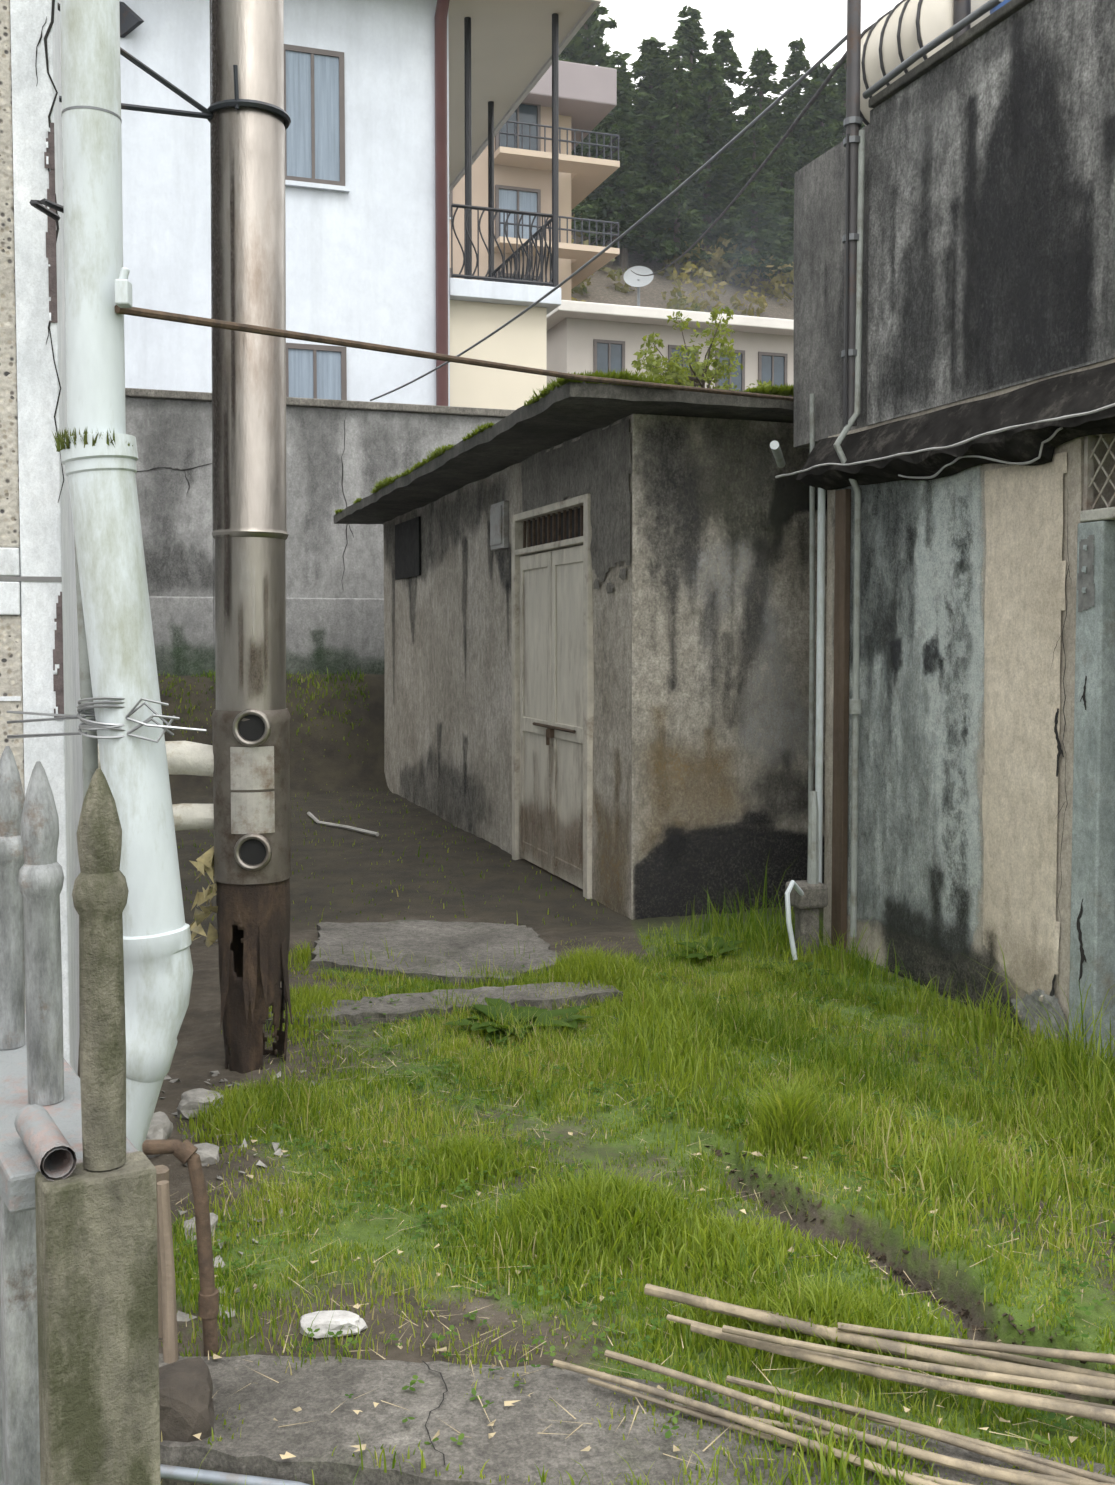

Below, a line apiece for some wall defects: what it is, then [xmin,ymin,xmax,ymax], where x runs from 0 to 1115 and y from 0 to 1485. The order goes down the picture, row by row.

water stain [825,20,1115,417]
water stain [286,484,512,676]
water stain [401,725,483,832]
water stain [595,420,1021,1028]
crack [1050,488,1087,997]